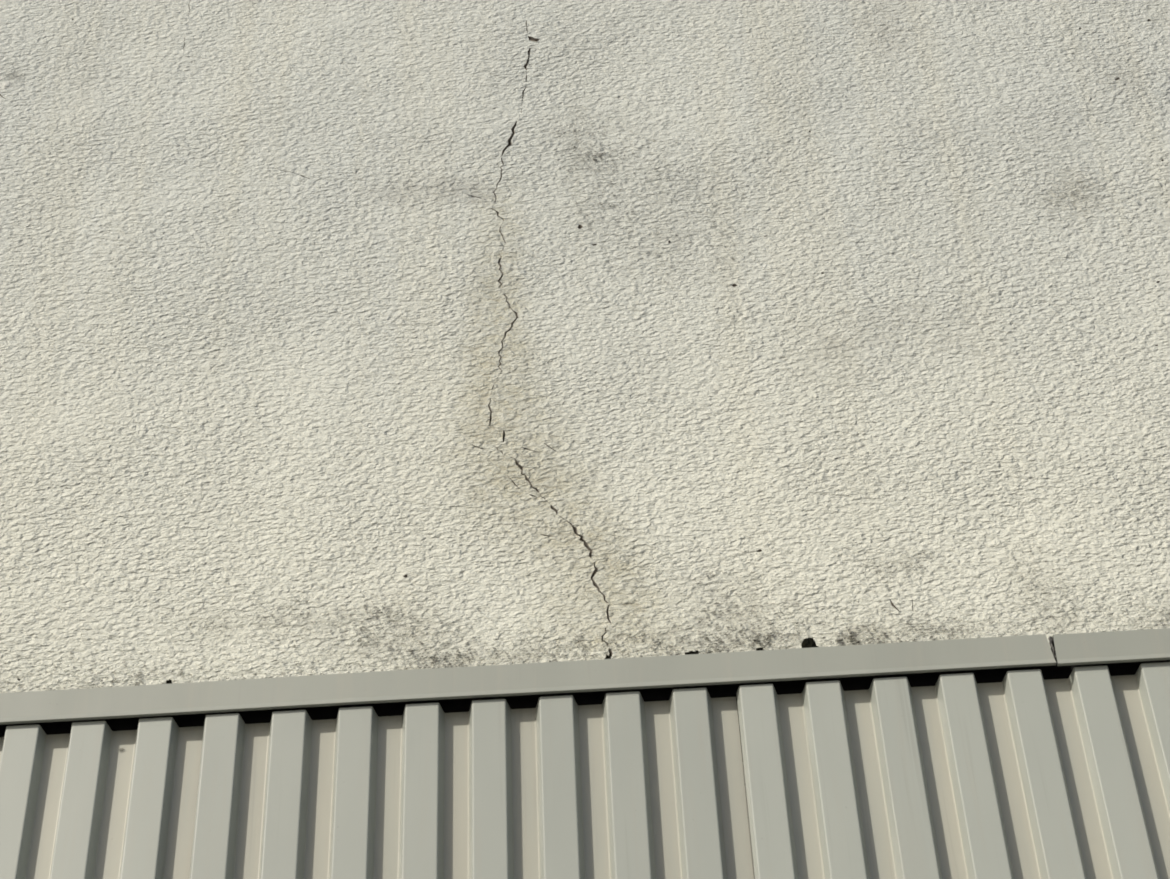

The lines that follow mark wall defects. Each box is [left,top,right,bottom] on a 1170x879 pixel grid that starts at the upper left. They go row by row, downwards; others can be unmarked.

crack [466,20,632,658]
damp [5,577,627,690]
damp [635,571,973,655]